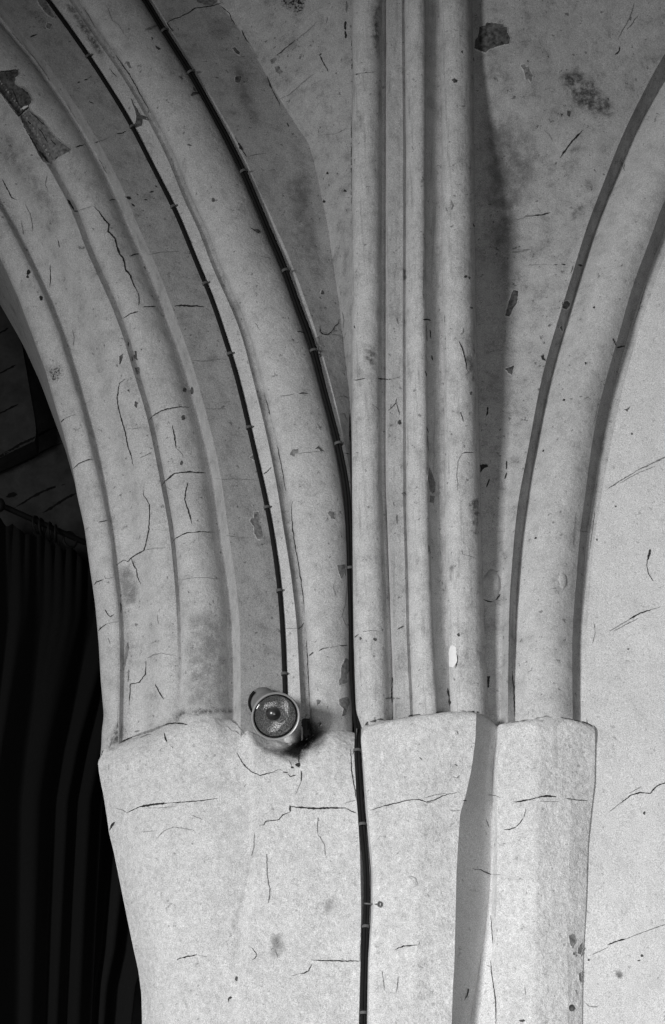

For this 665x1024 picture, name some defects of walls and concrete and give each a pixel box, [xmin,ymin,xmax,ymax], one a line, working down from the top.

spalling [473,21,512,54]
spalling [0,69,71,165]
crack [45,177,139,305]
crack [117,379,151,464]
crack [116,482,192,582]
crack [105,603,170,700]
crack [593,607,659,640]
crack [228,720,302,794]
crack [610,783,665,811]